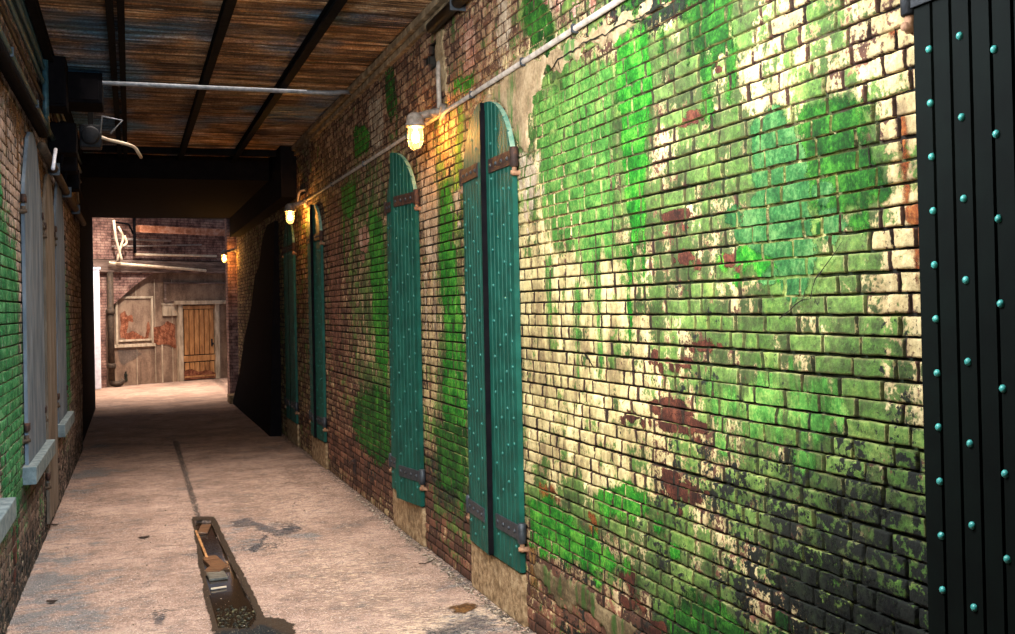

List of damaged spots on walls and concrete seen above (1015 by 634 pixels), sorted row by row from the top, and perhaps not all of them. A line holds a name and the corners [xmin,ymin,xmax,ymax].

water stain [631,0,738,129]
water stain [420,158,463,343]
water stain [545,255,553,344]
water stain [573,280,582,378]
water stain [594,270,604,368]
water stain [624,208,647,345]
rust [901,116,920,284]
water stain [545,615,595,634]
water stain [733,589,755,619]
water stain [764,527,912,634]